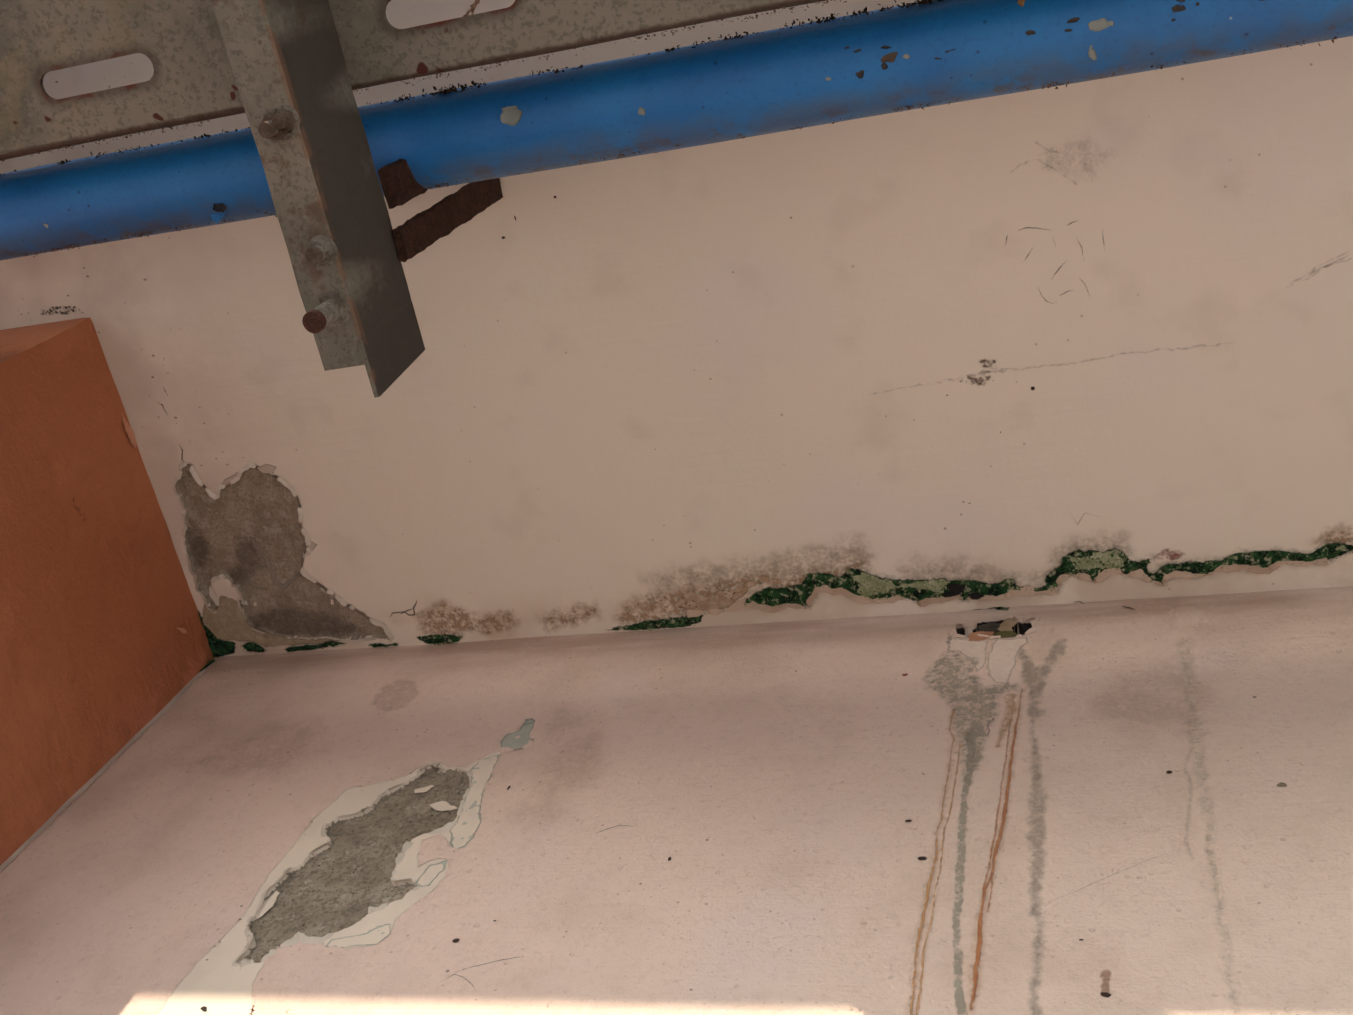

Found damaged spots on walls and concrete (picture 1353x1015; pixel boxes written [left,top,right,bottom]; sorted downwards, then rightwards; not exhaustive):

peeling [172,462,394,647]
leakage [619,576,805,622]
spalling [947,617,1039,683]
peeling [155,718,536,1015]
corrosion [910,711,961,1015]
leakage [926,655,1016,1014]
corrosion [970,694,1021,1010]